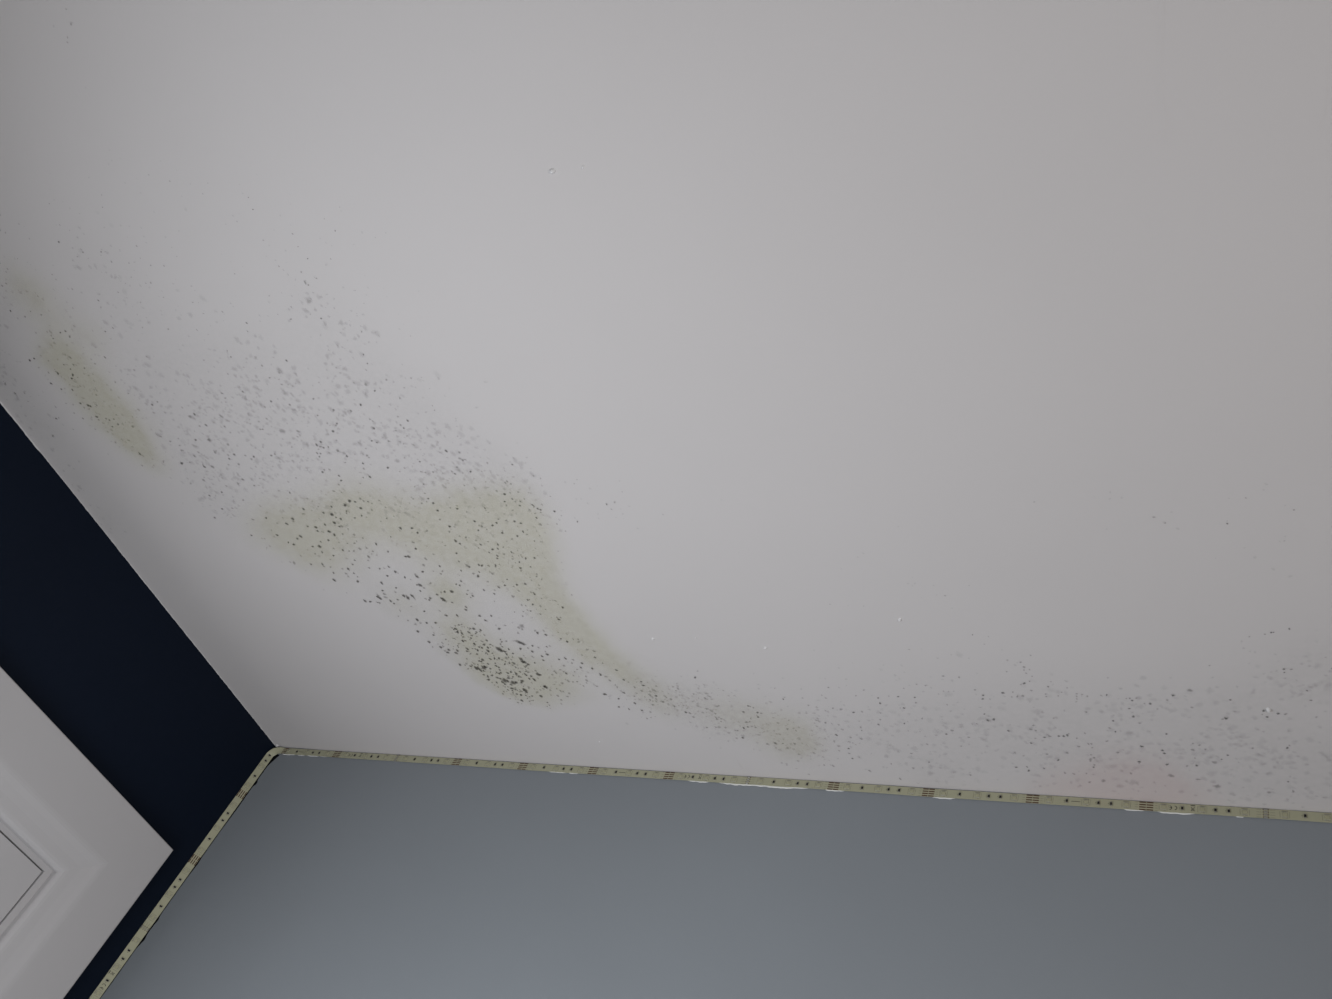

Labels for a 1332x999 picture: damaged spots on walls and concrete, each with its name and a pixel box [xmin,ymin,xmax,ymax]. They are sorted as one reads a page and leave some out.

damp [364,521,642,711]